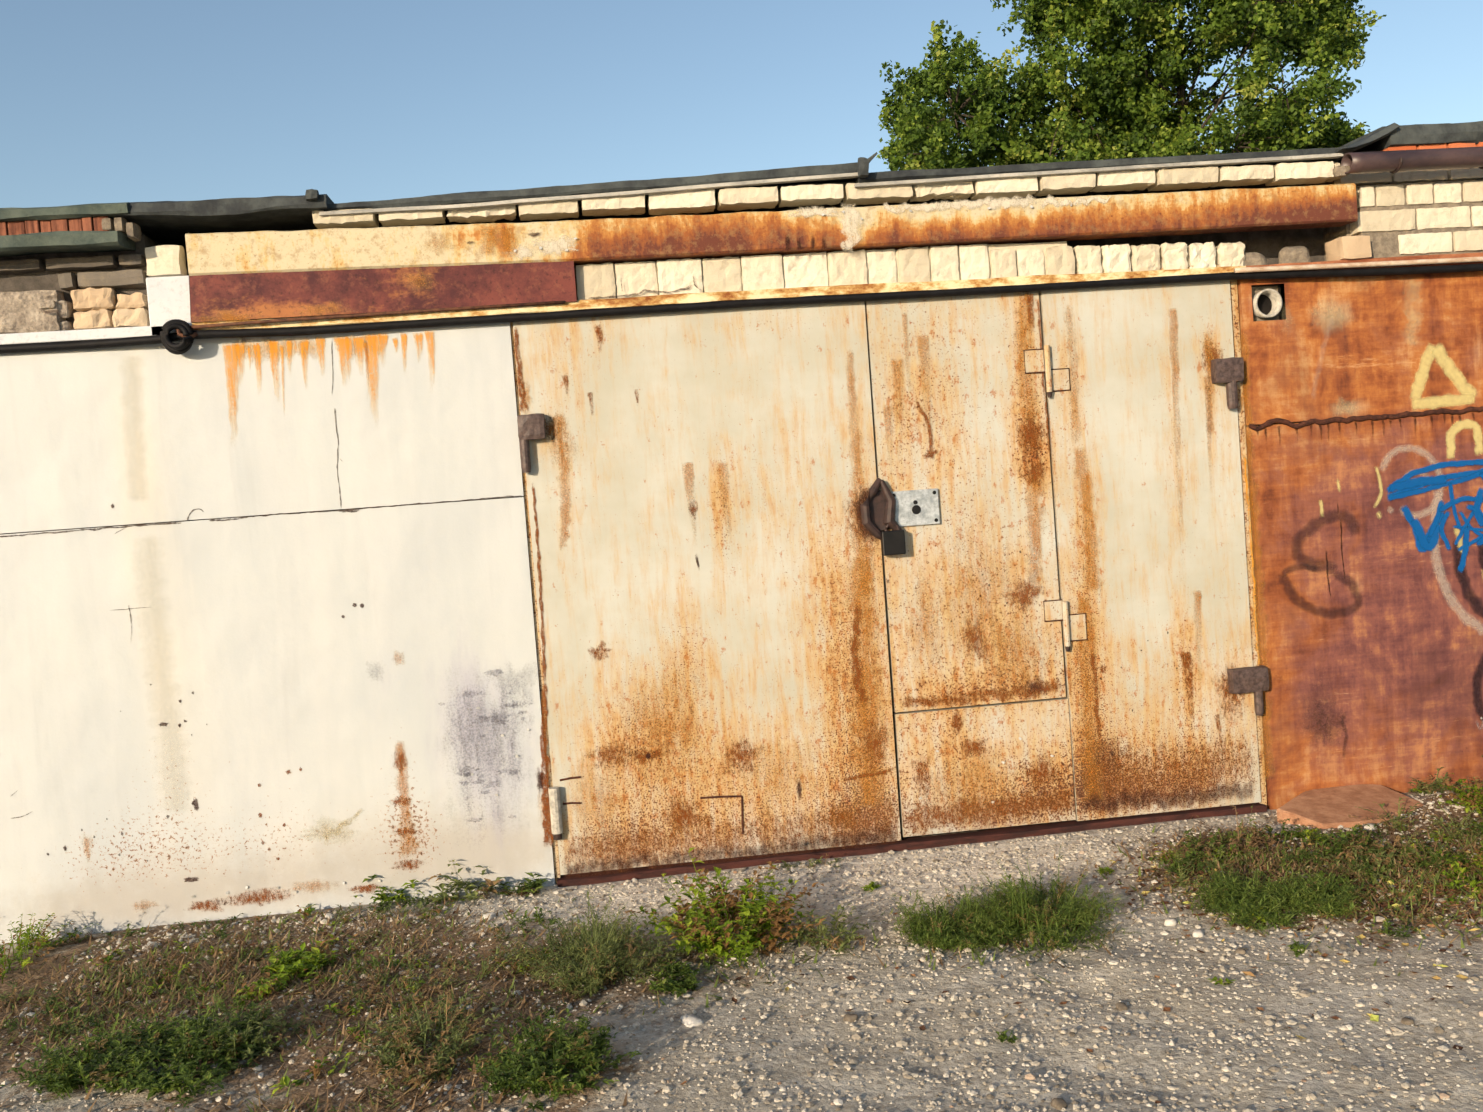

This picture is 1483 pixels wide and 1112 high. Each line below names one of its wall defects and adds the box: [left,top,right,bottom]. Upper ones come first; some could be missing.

corrosion [785,237,825,252]
corrosion [223,332,435,418]
corrosion [545,415,568,538]
corrosion [916,402,937,458]
corrosion [951,292,1050,661]
corrosion [1201,338,1223,428]
corrosion [1241,335,1475,665]
corrosion [532,434,895,877]
corrosion [902,669,1061,708]
corrosion [1077,451,1269,811]
corrosion [391,745,422,870]